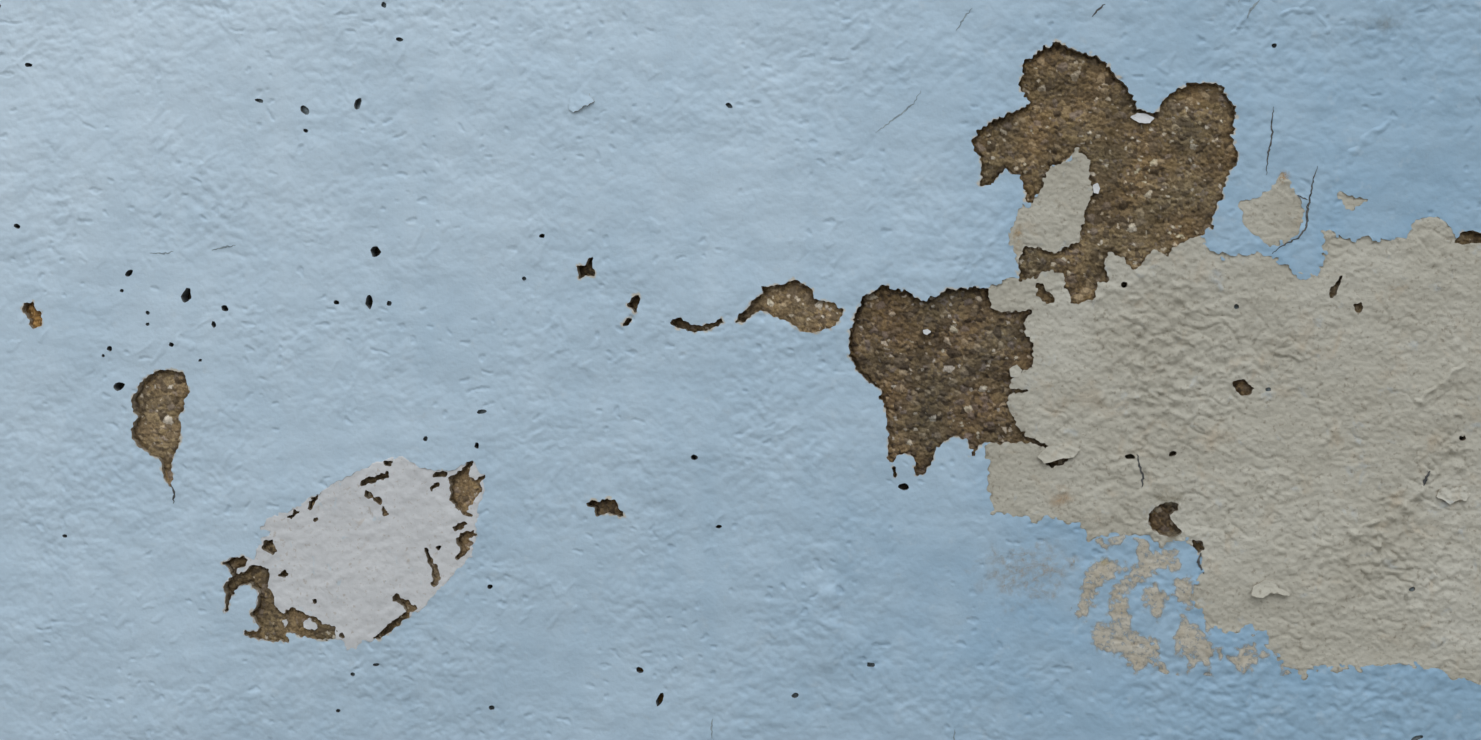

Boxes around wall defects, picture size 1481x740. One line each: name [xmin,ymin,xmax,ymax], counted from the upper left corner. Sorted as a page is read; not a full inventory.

peeling [26,303,42,328]
peeling [736,43,1481,685]
flaking render [119,370,190,504]
peeling [223,443,485,650]
peeling [589,499,623,516]